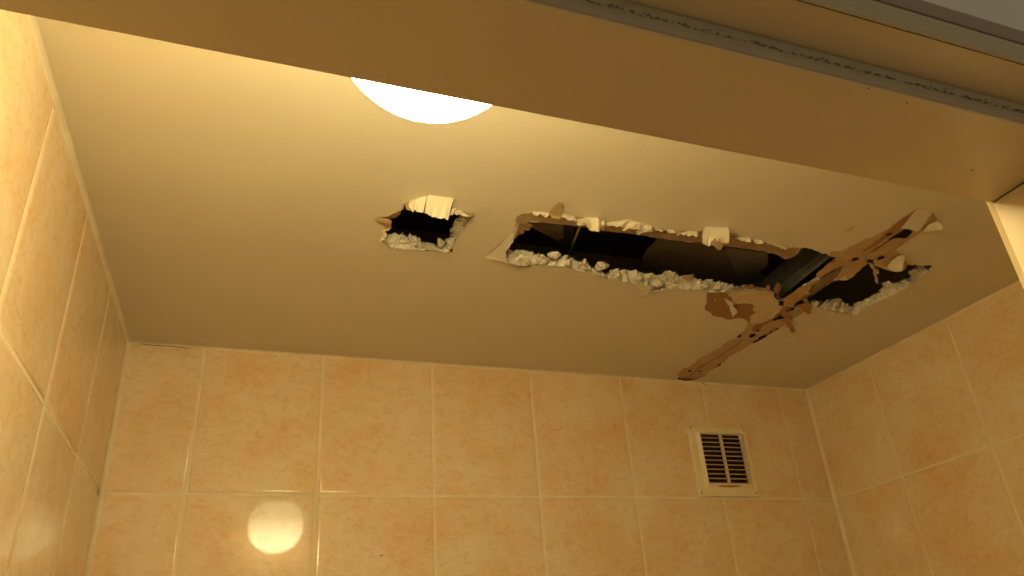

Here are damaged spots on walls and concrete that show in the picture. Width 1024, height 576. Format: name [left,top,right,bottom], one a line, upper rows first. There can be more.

spalling [384,216,472,253]
peeling [829,209,943,261]
spalling [507,249,791,379]
spalling [810,265,930,316]